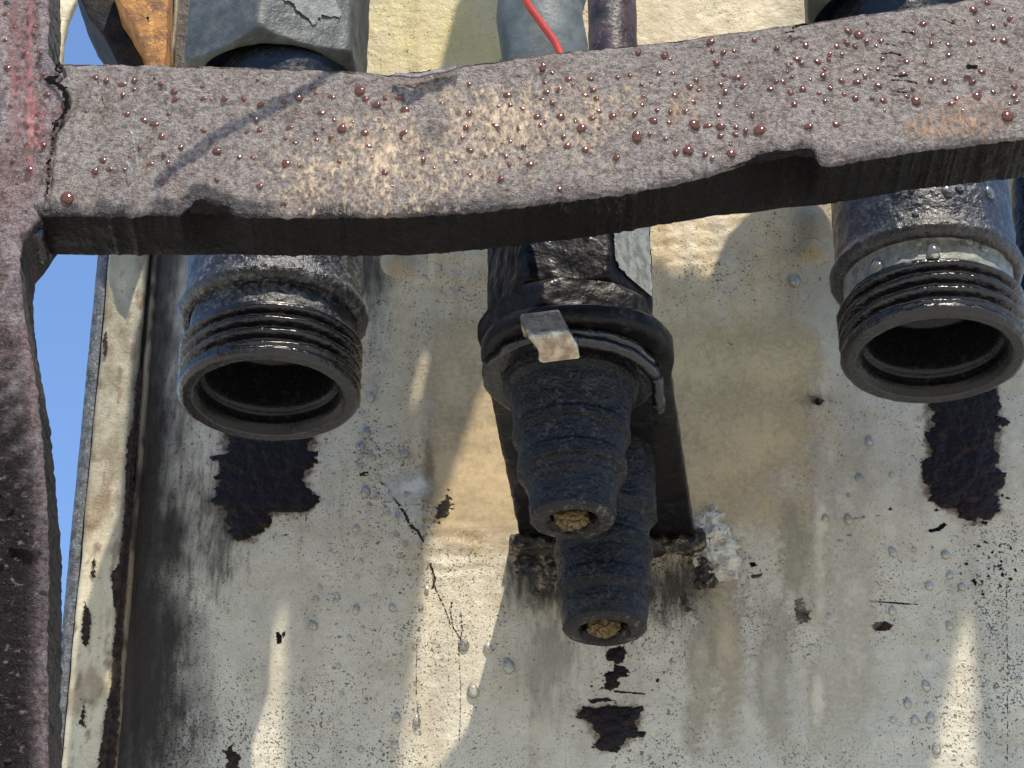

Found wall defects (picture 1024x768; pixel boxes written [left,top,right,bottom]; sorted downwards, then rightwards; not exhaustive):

crack [43,63,71,200]
rust [263,82,619,215]
rust [905,98,1000,137]
crack [429,563,463,741]